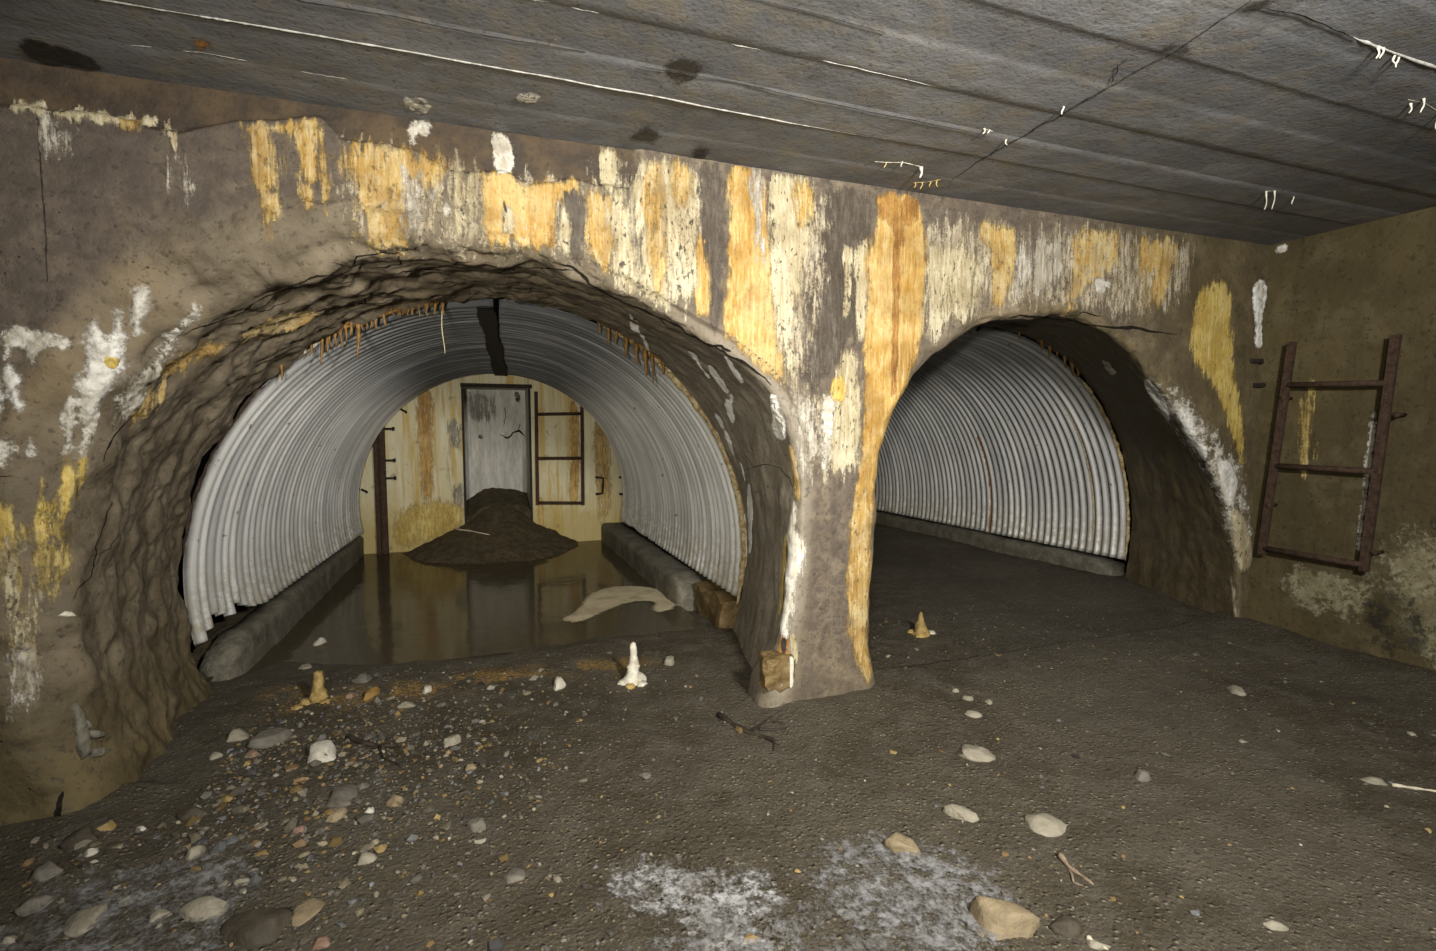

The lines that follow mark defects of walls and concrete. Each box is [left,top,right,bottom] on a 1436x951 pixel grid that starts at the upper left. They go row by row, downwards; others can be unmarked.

damp [9,99,196,205]
damp [516,92,540,104]
crack [639,0,1357,179]
crack [104,244,771,459]
damp [240,97,1253,683]
damp [1252,279,1267,348]
damp [0,286,319,712]
damp [1280,564,1430,656]